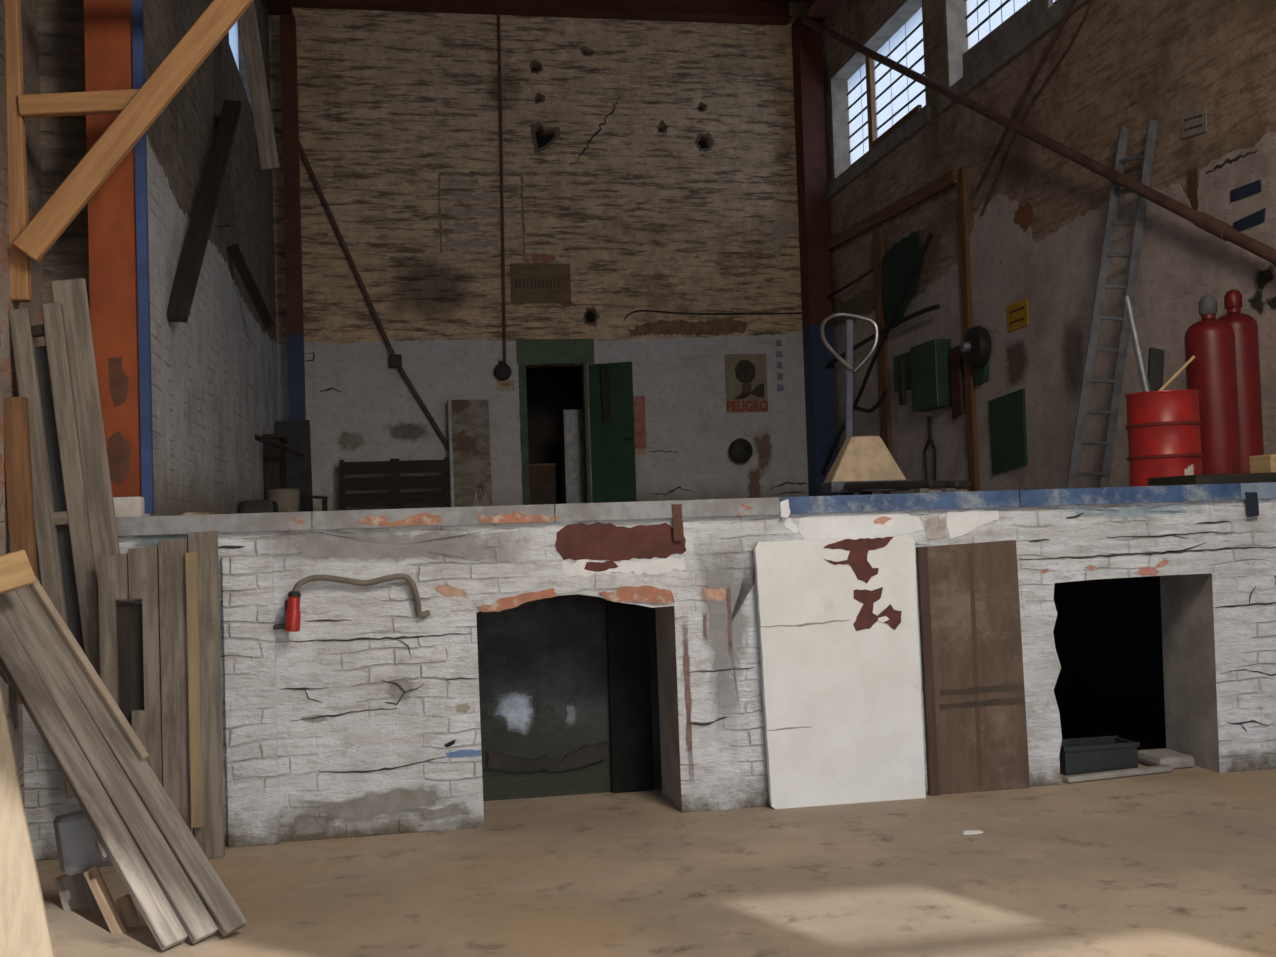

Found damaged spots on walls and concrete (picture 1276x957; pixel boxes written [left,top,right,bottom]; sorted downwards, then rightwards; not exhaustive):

spalling [530,121,561,154]
crack [570,95,622,166]
spalling [1014,202,1033,232]
peeling [555,522,686,572]
spalling [477,588,556,612]
spalling [599,585,675,604]
crack [275,619,477,721]
crack [319,756,446,773]
leakage [293,788,467,836]